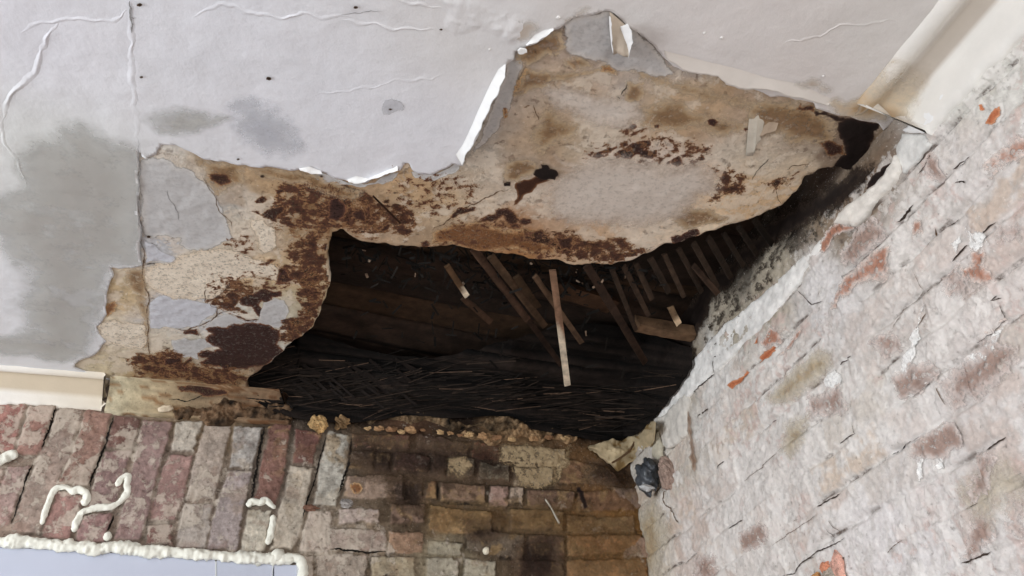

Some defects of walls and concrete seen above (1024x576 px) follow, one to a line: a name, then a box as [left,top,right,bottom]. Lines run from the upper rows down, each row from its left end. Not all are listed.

crack [128,1,136,33]
leakage [0,126,254,387]
leakage [196,155,362,242]
flaking render [75,11,883,389]
leakage [671,207,728,229]
mould [704,204,841,345]
crack [928,219,996,261]
flaking render [651,394,691,460]
crack [773,494,844,576]
crack [962,552,990,563]